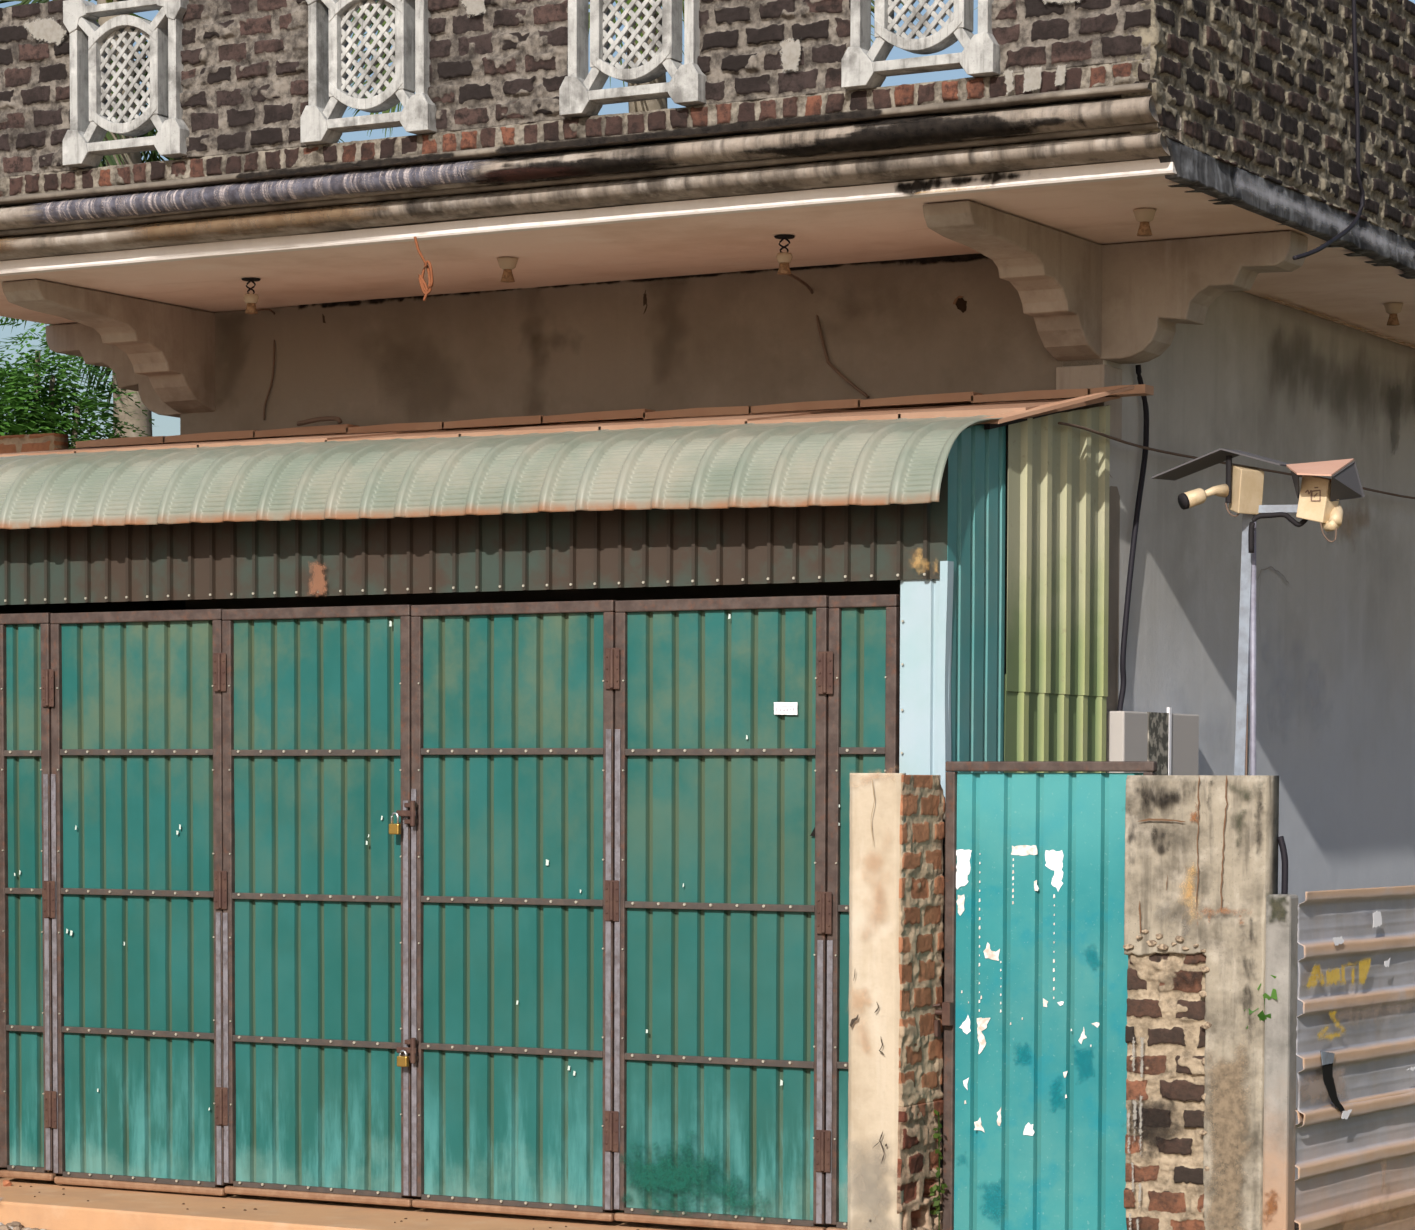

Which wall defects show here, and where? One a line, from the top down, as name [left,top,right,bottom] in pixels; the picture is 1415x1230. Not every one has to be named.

damp [28,100,1084,241]
rust [310,564,327,595]
damp [1137,789,1179,809]
damp [1232,786,1262,844]
spalling [1123,929,1212,1230]
spalling [885,1100,943,1230]